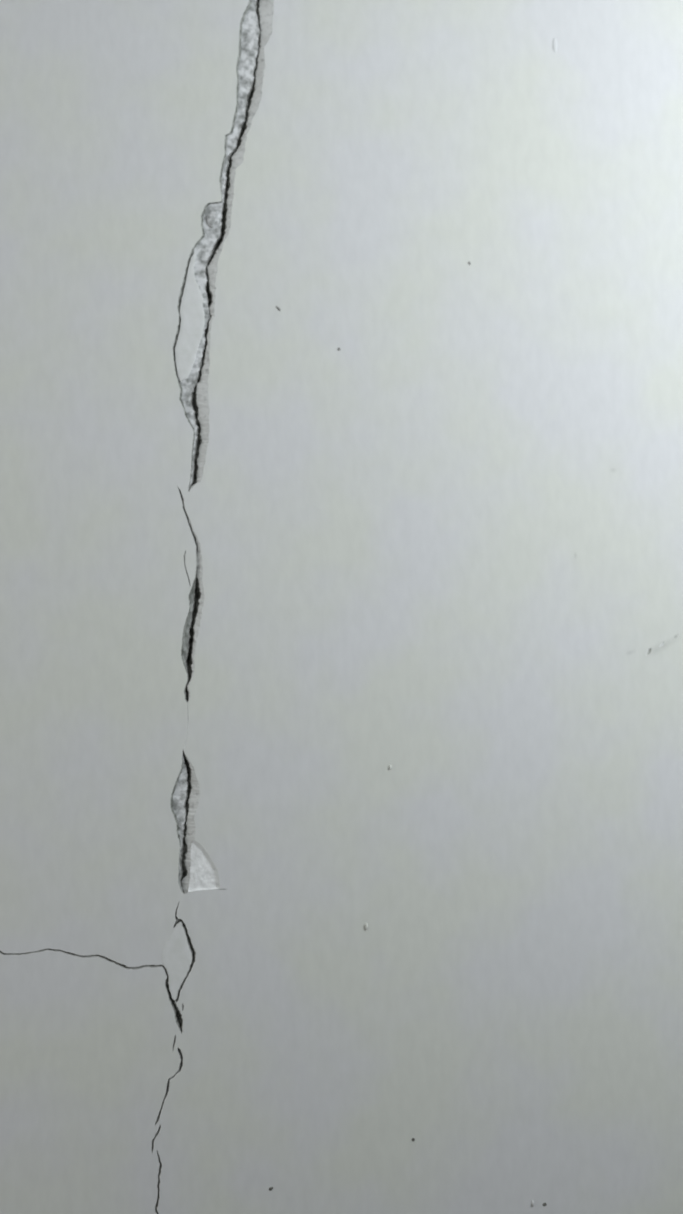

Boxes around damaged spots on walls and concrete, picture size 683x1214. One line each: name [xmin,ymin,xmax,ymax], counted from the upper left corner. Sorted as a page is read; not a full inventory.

crack [0,0,274,1214]
peeling [188,840,226,892]